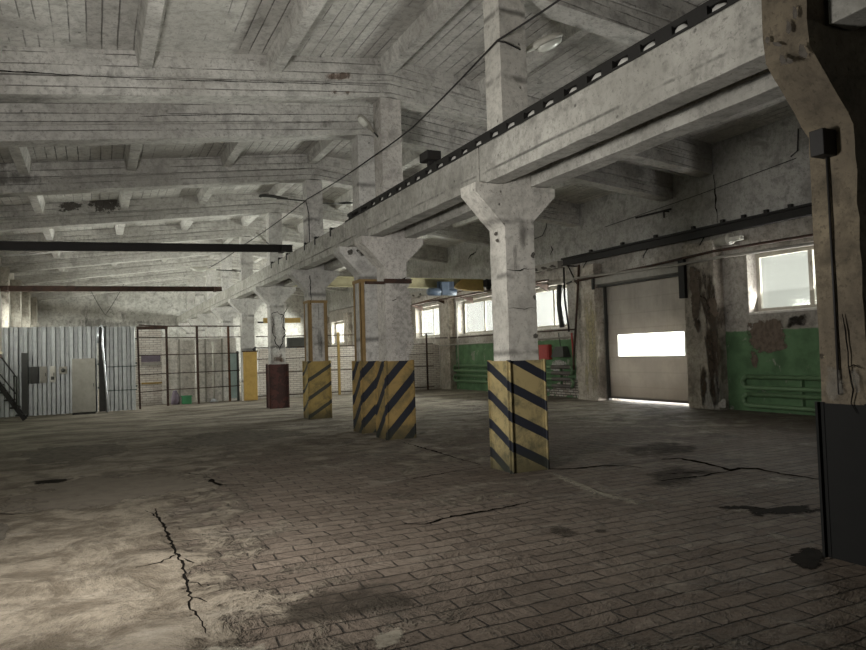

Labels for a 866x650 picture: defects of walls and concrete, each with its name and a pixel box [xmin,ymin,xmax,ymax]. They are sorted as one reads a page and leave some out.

peeling [747,318,788,368]
spalling [700,375,726,410]
crack [550,463,642,471]
crack [661,458,816,479]
crack [404,501,531,524]
crack [139,508,207,633]